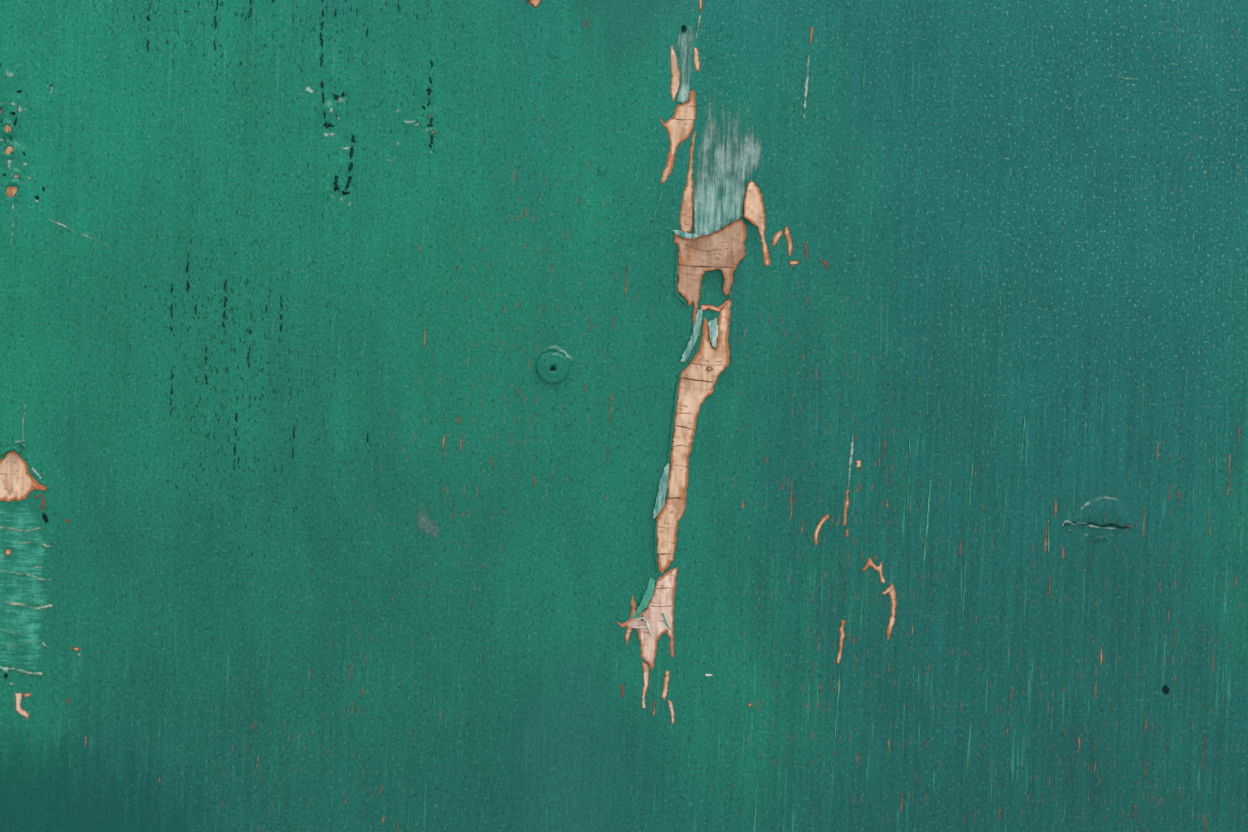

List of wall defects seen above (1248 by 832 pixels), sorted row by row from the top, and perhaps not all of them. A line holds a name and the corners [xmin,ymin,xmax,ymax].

peeling [617,35,829,724]
peeling [0,440,52,719]
peeling [862,558,897,641]